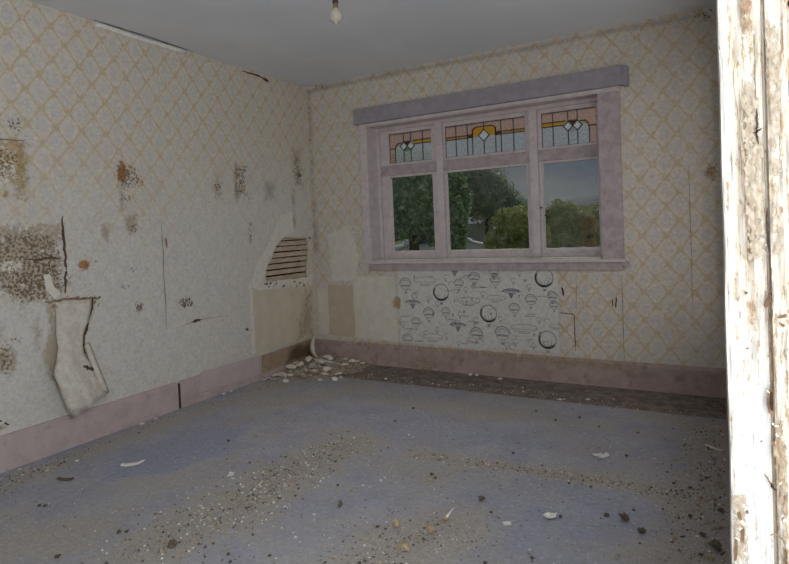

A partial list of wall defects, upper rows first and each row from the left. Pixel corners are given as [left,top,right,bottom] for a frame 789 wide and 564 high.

rust [117,161,143,201]
flaking render [740,0,784,261]
flaking render [0,224,70,384]
crack [60,216,68,294]
flaking render [253,237,315,373]
flaking render [732,495,750,564]
peeling [764,387,789,564]